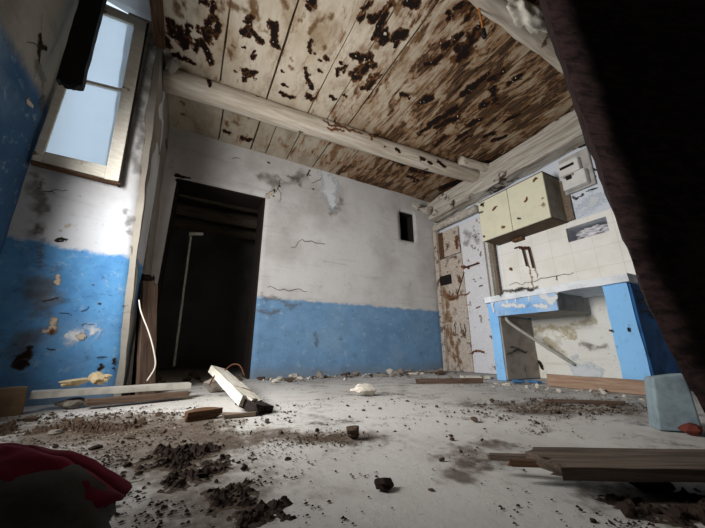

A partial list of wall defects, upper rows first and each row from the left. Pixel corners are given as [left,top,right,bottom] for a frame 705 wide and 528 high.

water stain [173,0,186,18]
water stain [218,0,260,21]
water stain [386,32,421,77]
rust [323,119,384,140]
peeling [500,292,559,309]
spalling [41,317,58,334]
spalling [11,345,34,370]